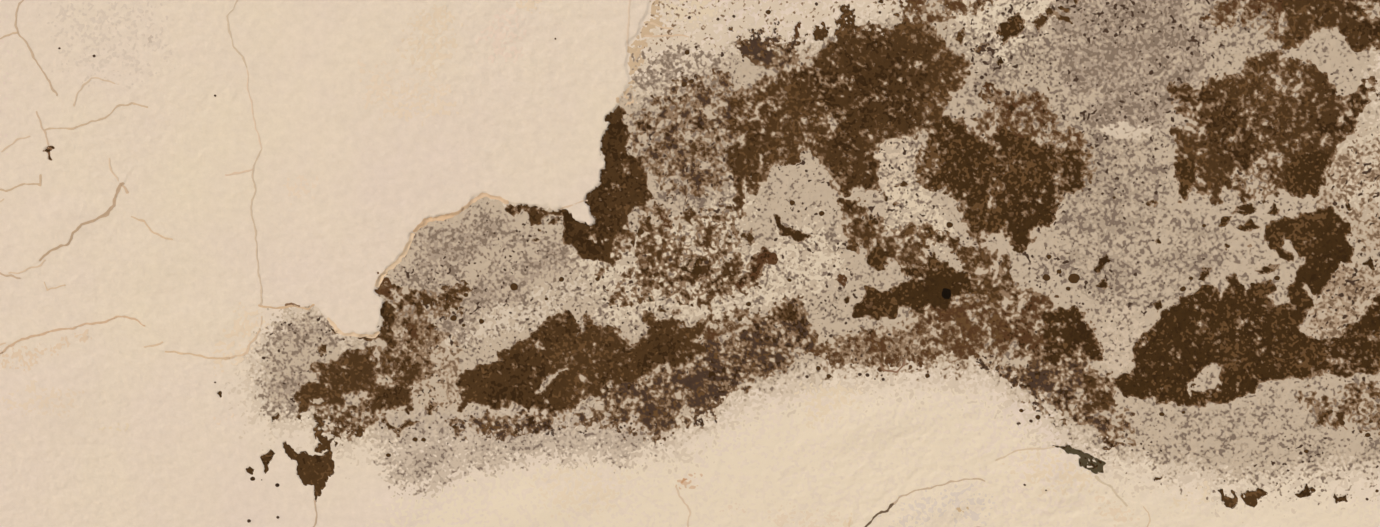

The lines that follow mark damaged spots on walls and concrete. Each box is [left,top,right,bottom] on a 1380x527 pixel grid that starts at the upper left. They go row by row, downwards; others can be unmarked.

crack [0,0,380,360]
peeling [246,0,1380,509]